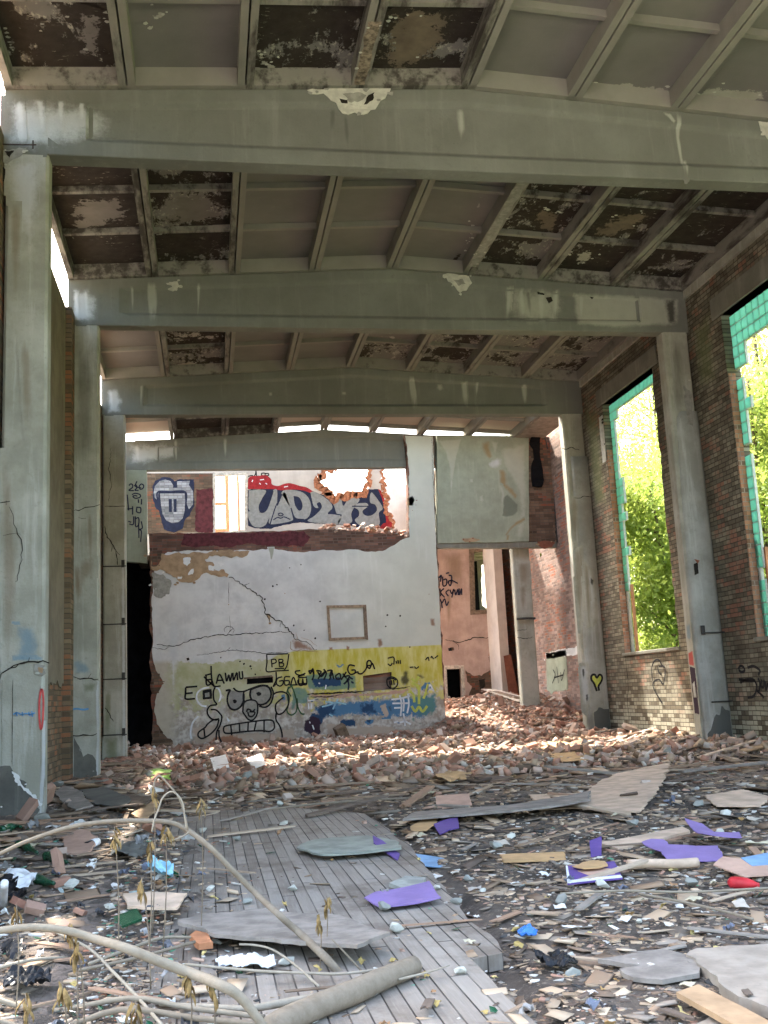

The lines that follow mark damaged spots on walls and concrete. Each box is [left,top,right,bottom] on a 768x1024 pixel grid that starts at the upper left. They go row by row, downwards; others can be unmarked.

peeling [307,6,465,115]
spalling [443,183,529,295]
spalling [314,469,396,529]
crack [0,501,23,581]
flaking render [144,549,249,598]
crack [156,577,317,655]
crack [0,660,49,733]